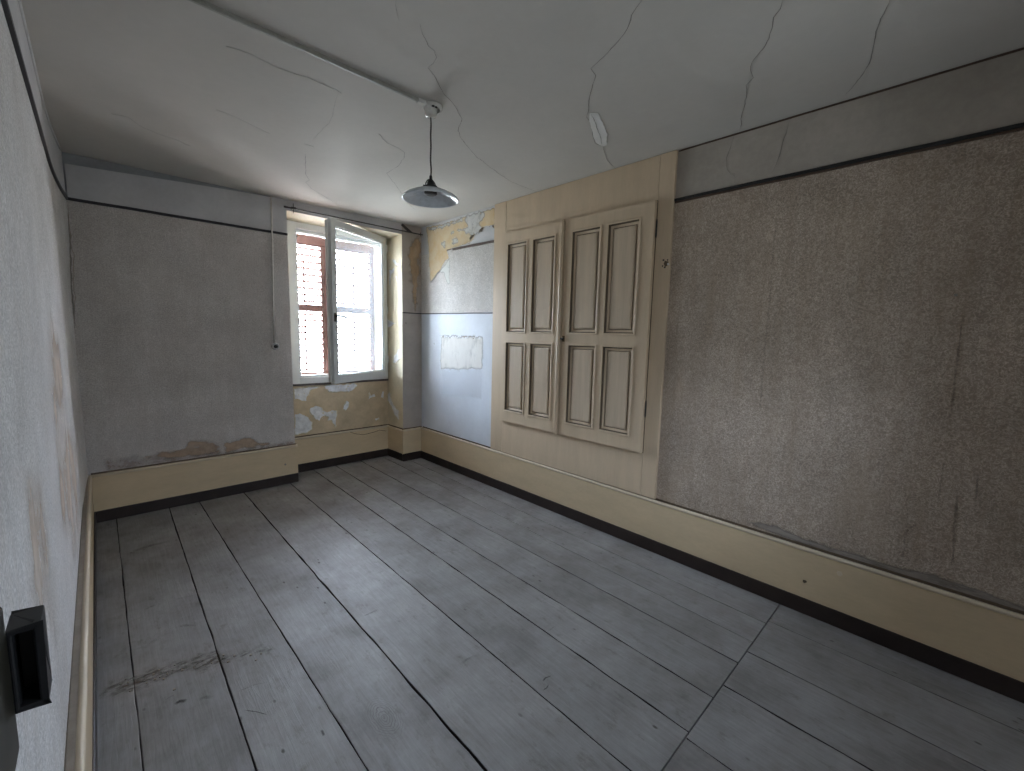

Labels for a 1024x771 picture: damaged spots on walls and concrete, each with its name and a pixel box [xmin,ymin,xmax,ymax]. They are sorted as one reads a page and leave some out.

crack [586,0,642,166]
crack [726,0,783,183]
crack [846,1,890,94]
peeling [293,383,358,436]